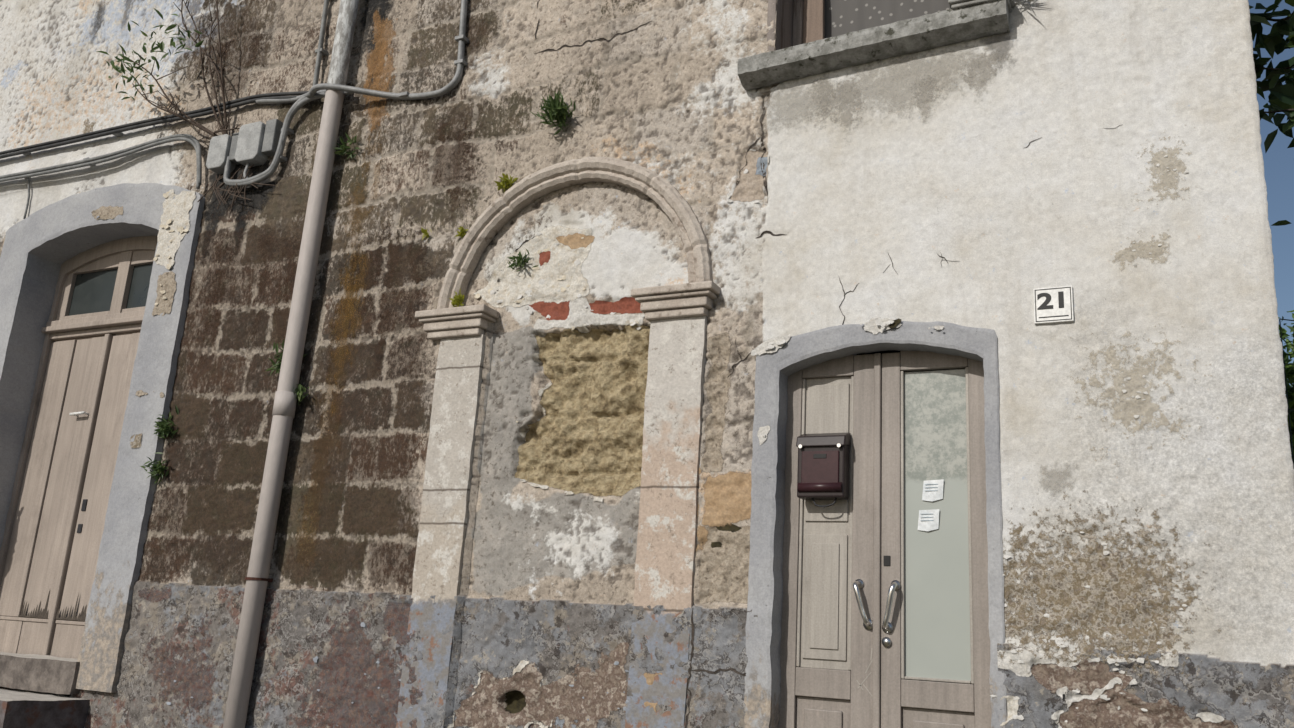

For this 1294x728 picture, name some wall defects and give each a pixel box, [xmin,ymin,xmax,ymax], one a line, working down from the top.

crack [534,0,651,54]
peeling [1141,136,1190,201]
peeling [152,189,196,316]
peeling [1113,232,1170,270]
crack [838,254,897,325]
spalling [474,225,651,503]
spalling [997,491,1238,728]
spalling [447,642,662,728]
peeling [990,695,1024,726]